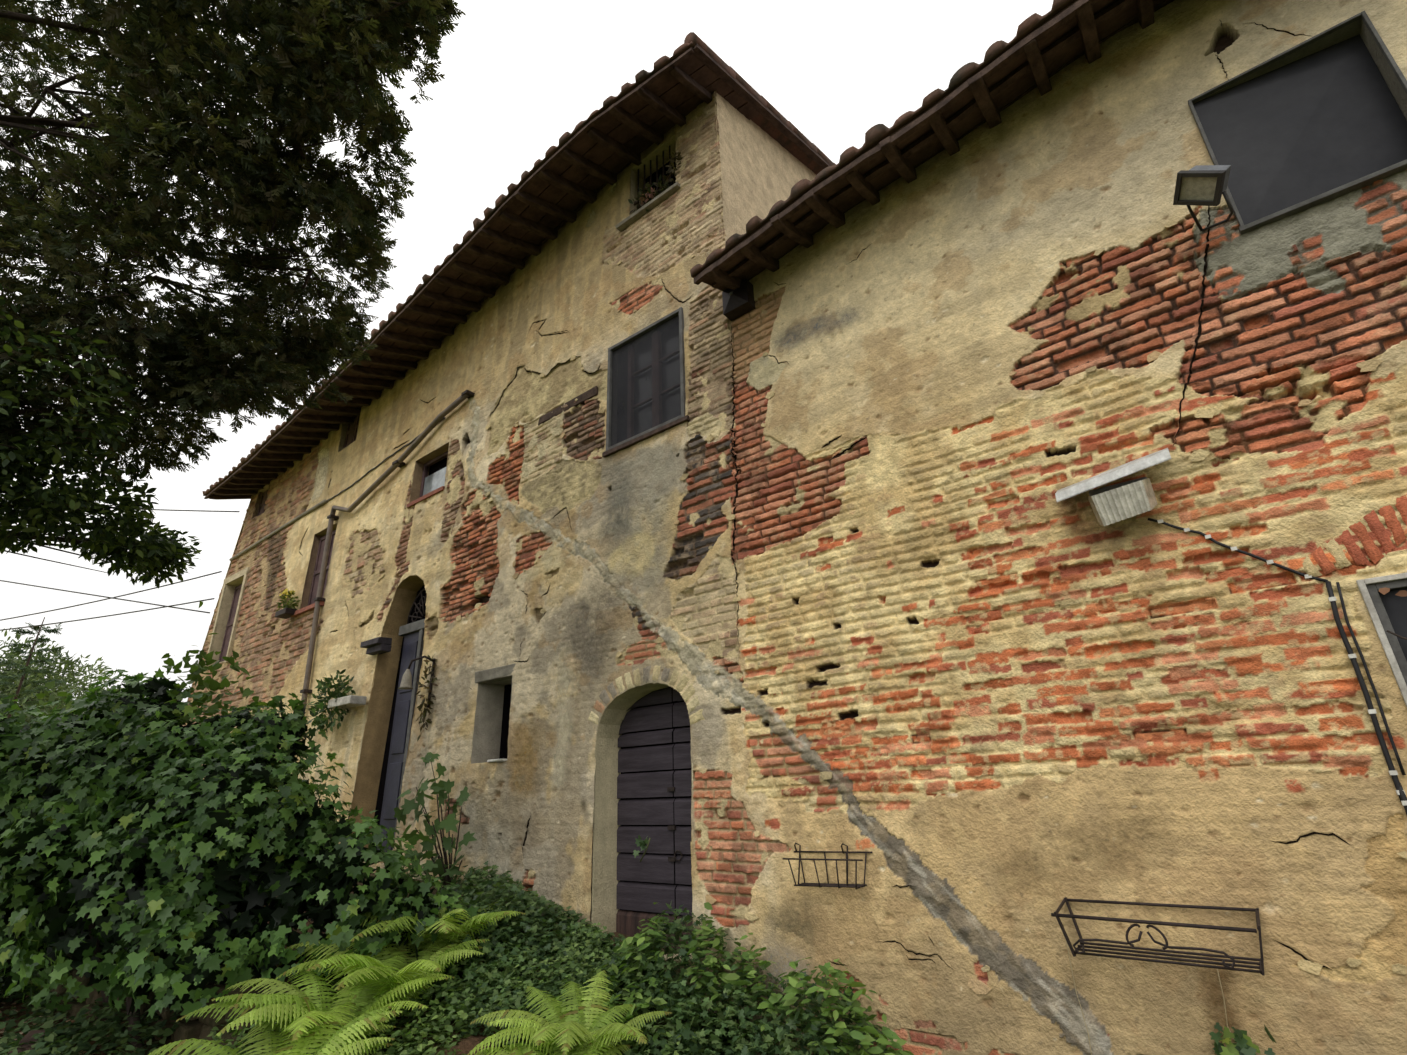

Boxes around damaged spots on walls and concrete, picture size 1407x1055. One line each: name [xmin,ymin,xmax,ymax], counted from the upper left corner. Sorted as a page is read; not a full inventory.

crack [1204,0,1311,80]
flaking render [600,91,726,315]
crack [490,318,600,414]
crack [1172,206,1211,446]
flaking render [425,355,612,639]
flaking render [615,180,1407,813]
flaking render [692,768,792,928]
crack [1270,828,1352,845]
crack [1273,939,1333,970]